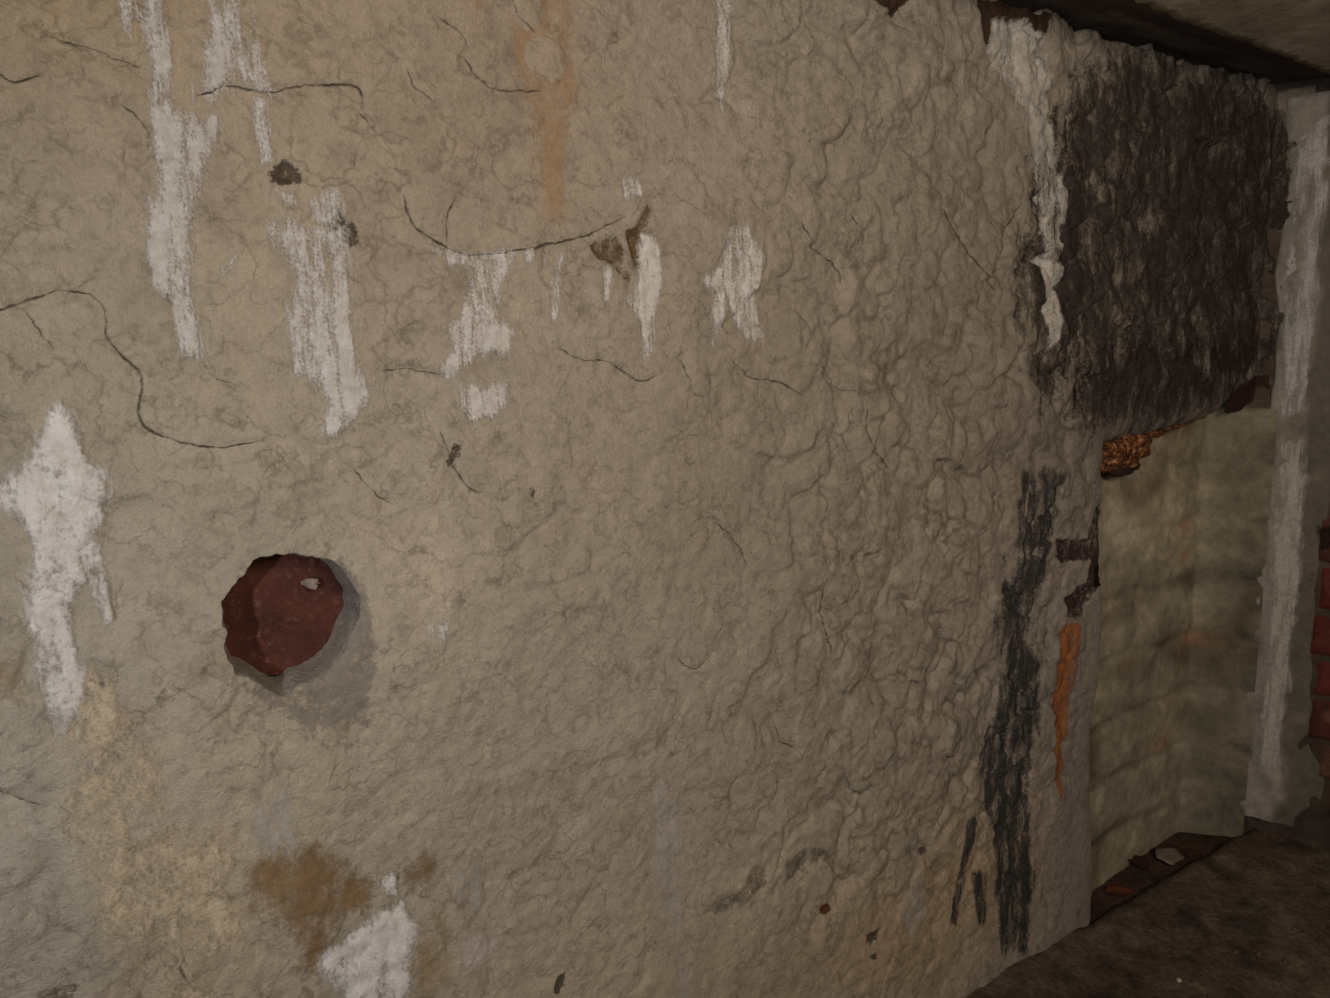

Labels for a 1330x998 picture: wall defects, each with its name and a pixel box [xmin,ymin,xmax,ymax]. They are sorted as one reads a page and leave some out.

crack [0,74,40,83]
crack [194,83,370,130]
crack [435,13,541,92]
leakage [119,0,276,362]
crack [0,290,262,448]
rust [1101,416,1206,477]
flaking render [221,553,344,675]
leakage [0,403,240,998]
leakage [951,467,1065,955]
rust [1052,624,1081,796]
rust [254,846,371,966]
leakage [317,873,418,998]